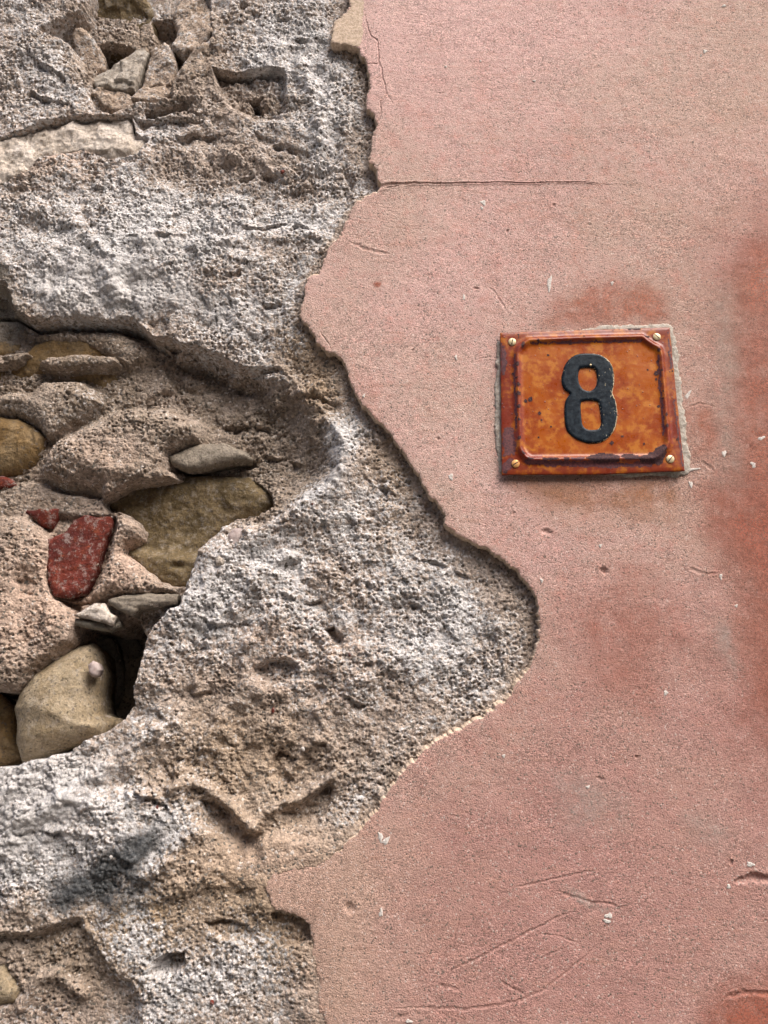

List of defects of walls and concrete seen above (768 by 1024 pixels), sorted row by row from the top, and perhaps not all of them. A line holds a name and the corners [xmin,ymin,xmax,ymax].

crack [363,10,395,122]
crack [380,180,633,189]
corrosion [500,328,684,473]
spalling [0,0,541,1024]